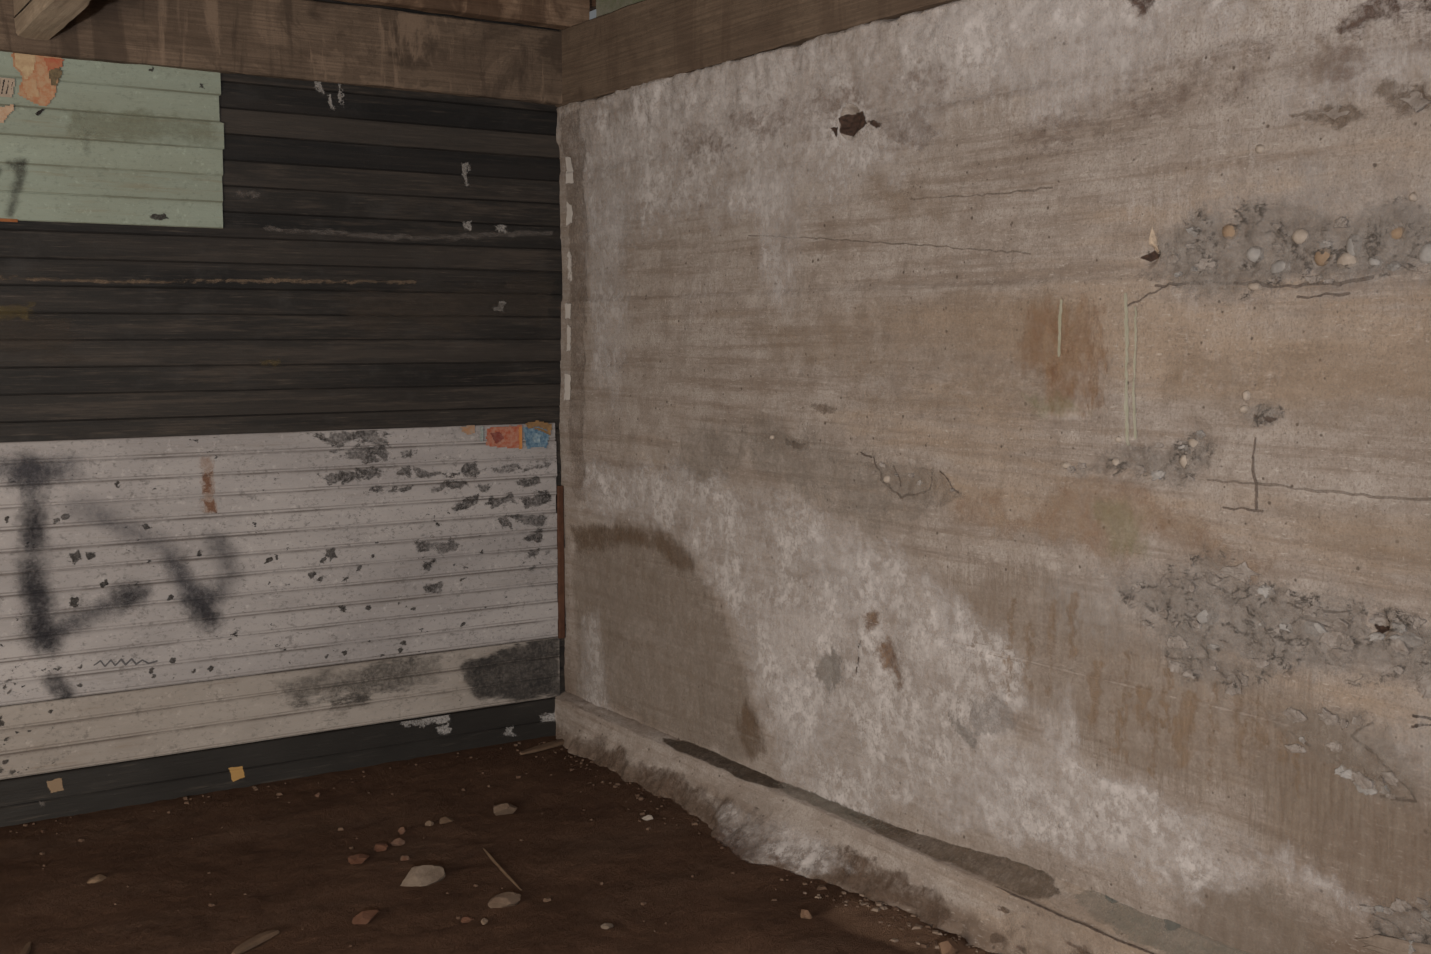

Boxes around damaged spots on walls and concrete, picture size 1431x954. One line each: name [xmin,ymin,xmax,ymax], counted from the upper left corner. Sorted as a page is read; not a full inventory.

spalling [1149,192,1431,299]
rust [203,473,217,513]
peeling [314,430,552,568]
crack [1207,437,1278,513]
crack [1336,490,1382,499]
peeling [308,548,337,582]
peeling [415,523,468,593]
spalling [1119,551,1431,699]
water stain [575,463,1222,890]